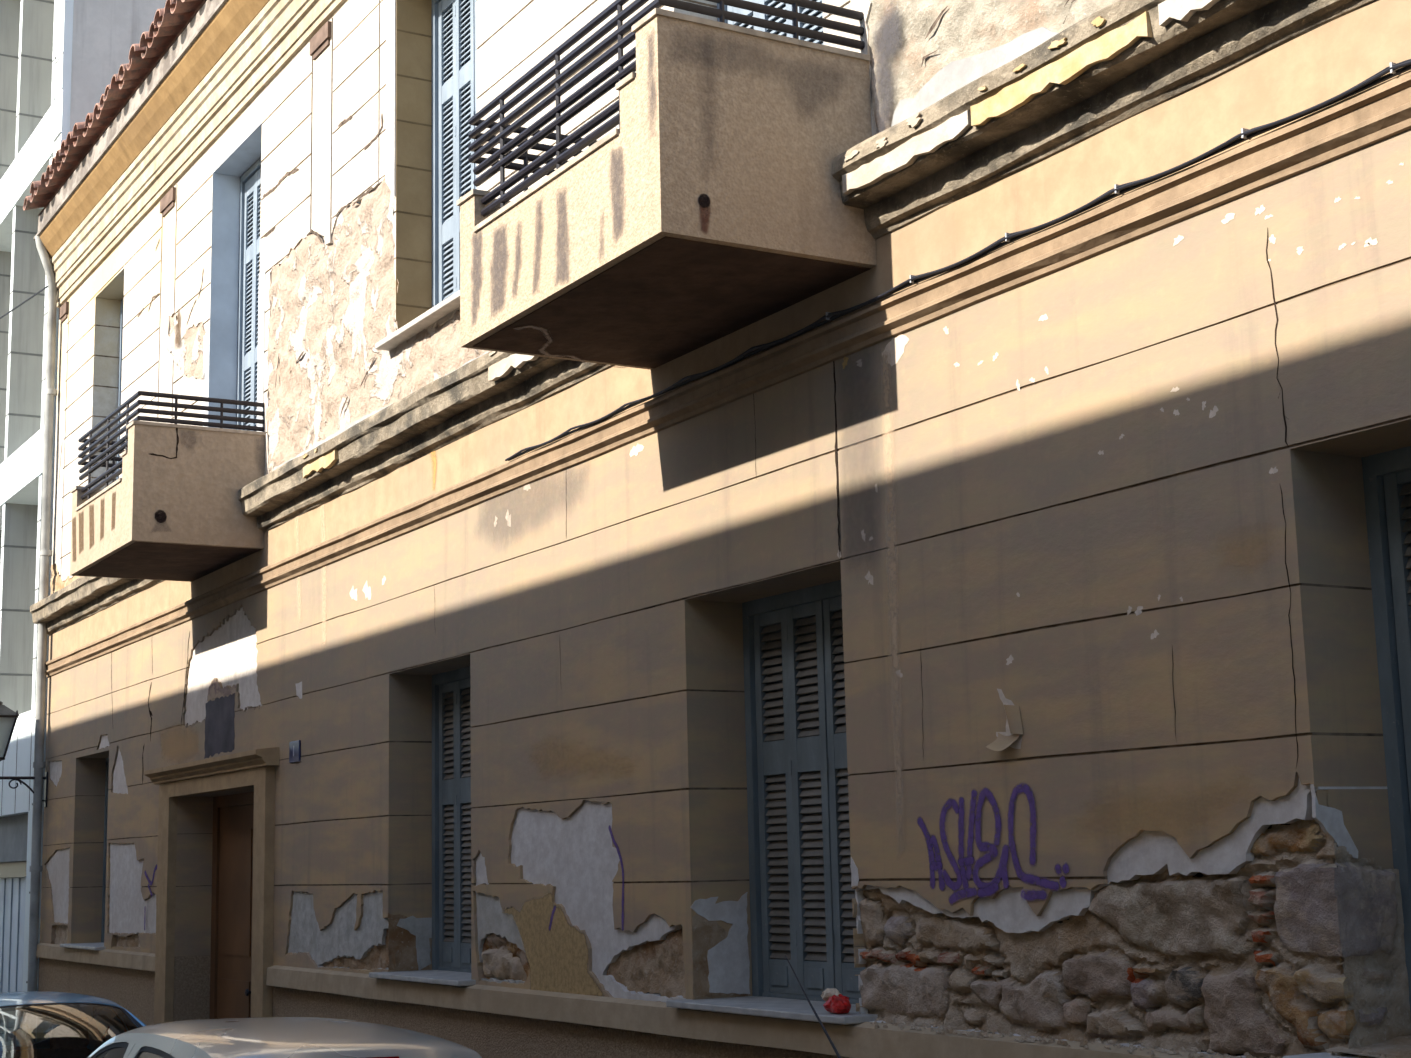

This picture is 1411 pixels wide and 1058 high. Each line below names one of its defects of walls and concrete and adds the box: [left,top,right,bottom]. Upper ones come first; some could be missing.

leakage [472,194,568,320]
leakage [601,152,623,246]
rust [700,206,710,233]
crack [1266,228,1289,447]
peeling [185,607,262,726]
crack [1280,486,1298,767]
peeling [99,735,128,794]
peeling [46,848,70,944]
peeling [109,843,156,948]
peeling [288,891,432,971]
peeling [475,801,750,1002]
spalling [850,779,1411,1058]